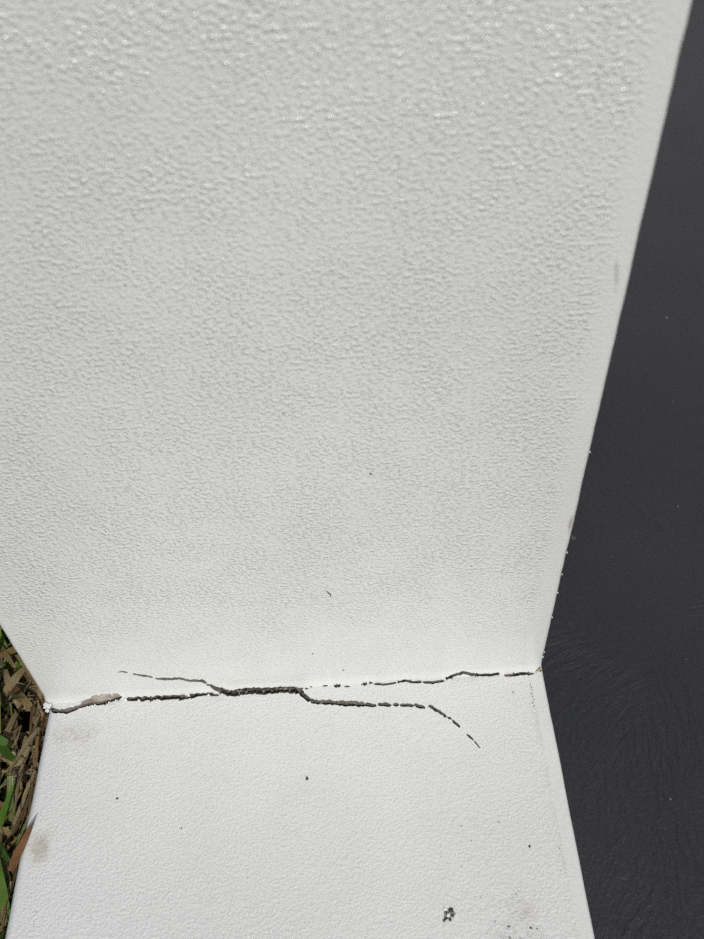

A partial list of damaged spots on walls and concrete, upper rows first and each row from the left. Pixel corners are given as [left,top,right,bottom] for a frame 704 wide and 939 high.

crack [51,671,534,748]